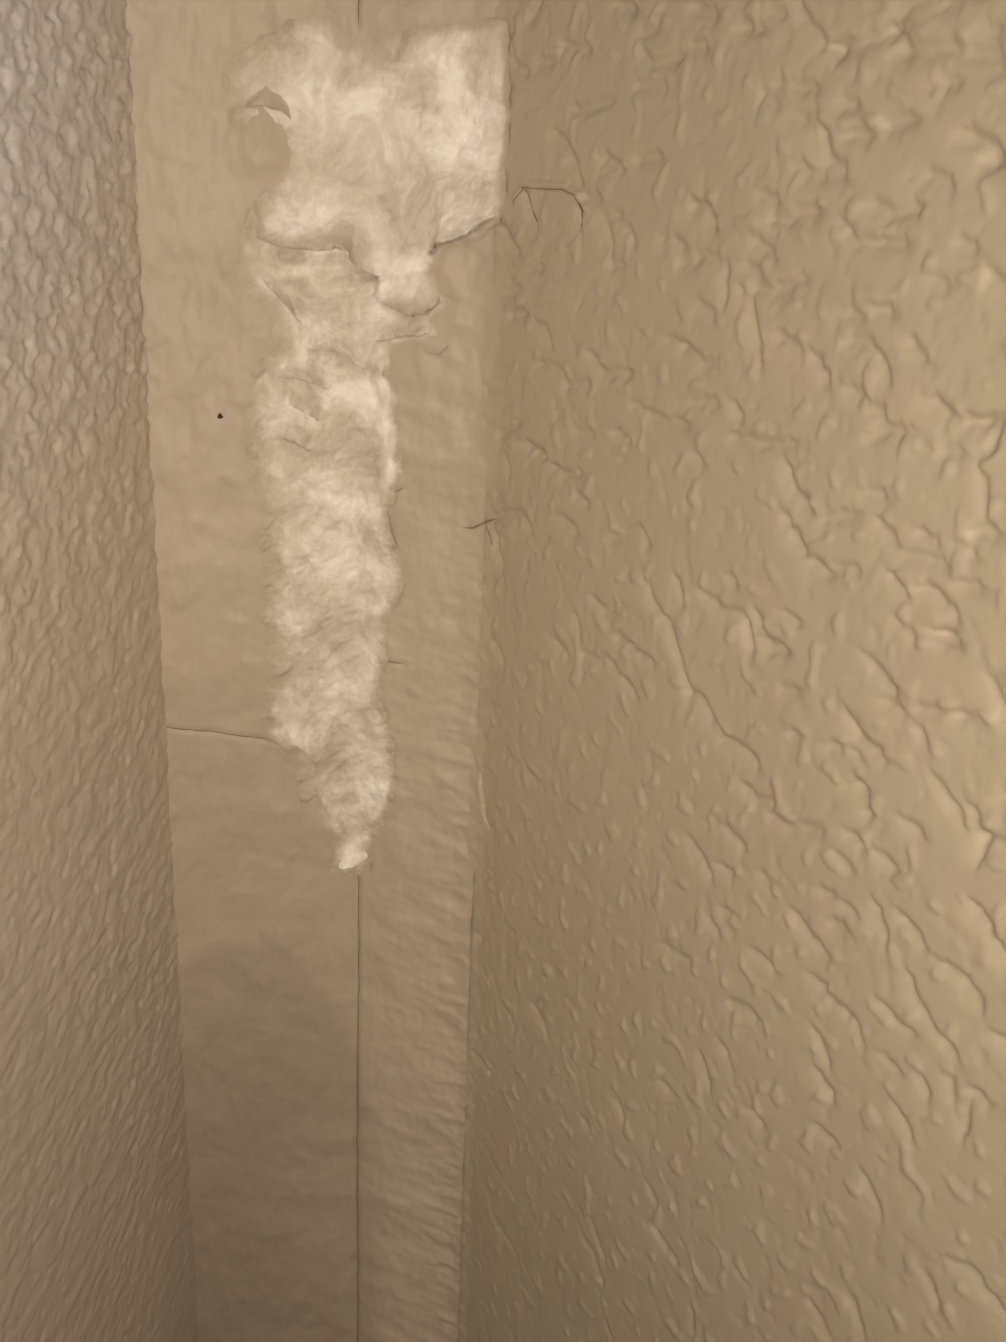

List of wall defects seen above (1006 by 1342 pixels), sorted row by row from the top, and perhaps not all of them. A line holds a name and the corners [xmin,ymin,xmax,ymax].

spalling [222,3,511,878]